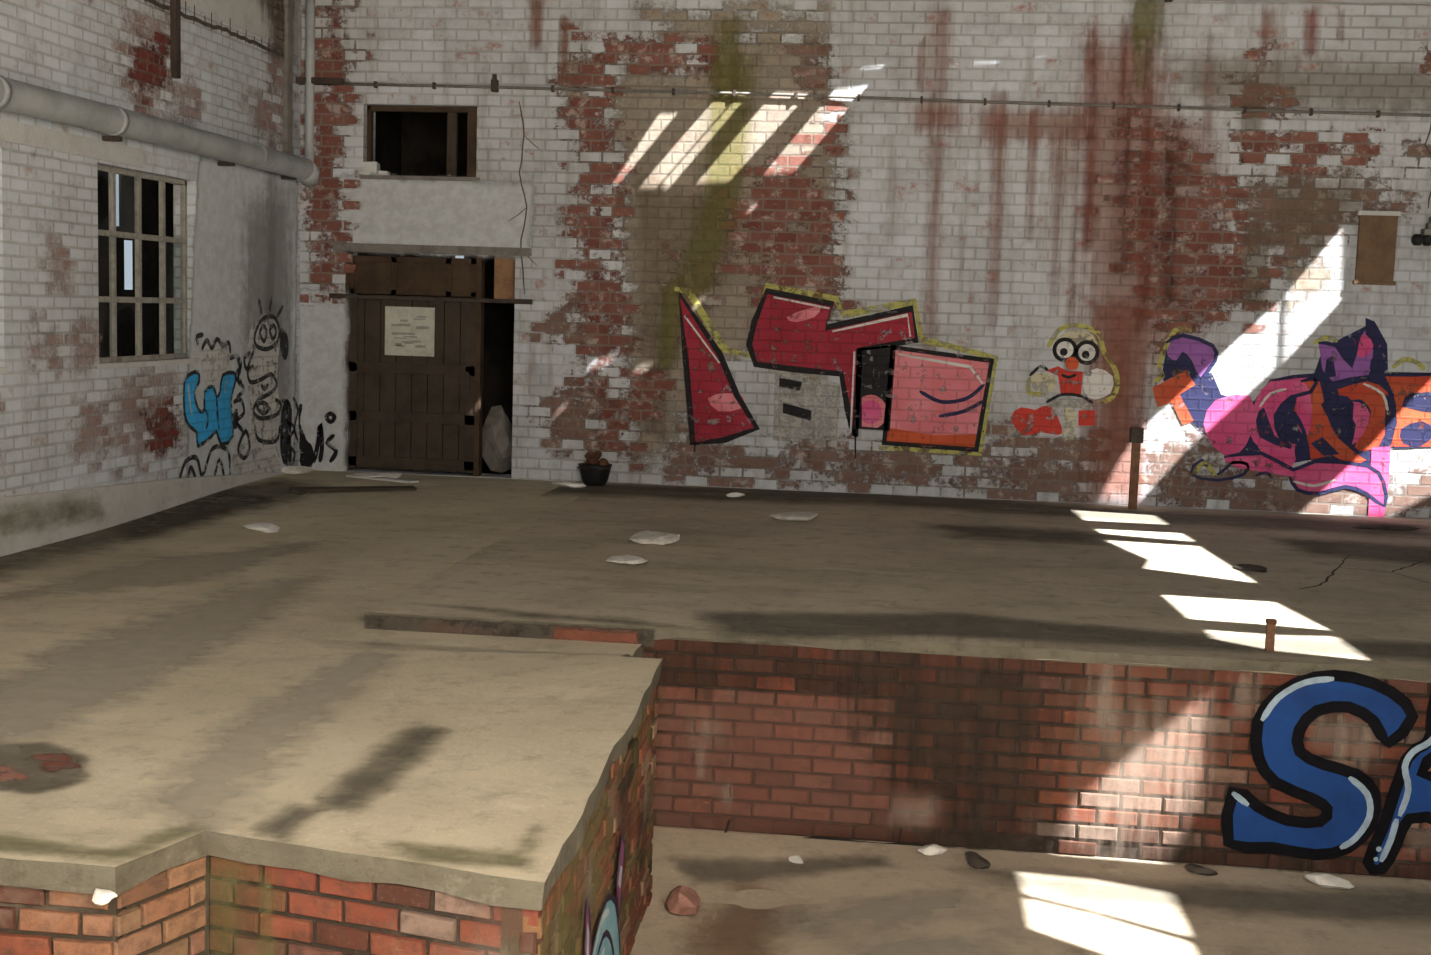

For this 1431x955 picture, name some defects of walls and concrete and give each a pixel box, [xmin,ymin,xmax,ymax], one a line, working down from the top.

peeling [116,11,201,120]
peeling [254,43,283,147]
peeling [299,0,374,306]
leakage [716,20,738,98]
peeling [526,0,1112,503]
peeling [1217,40,1431,315]